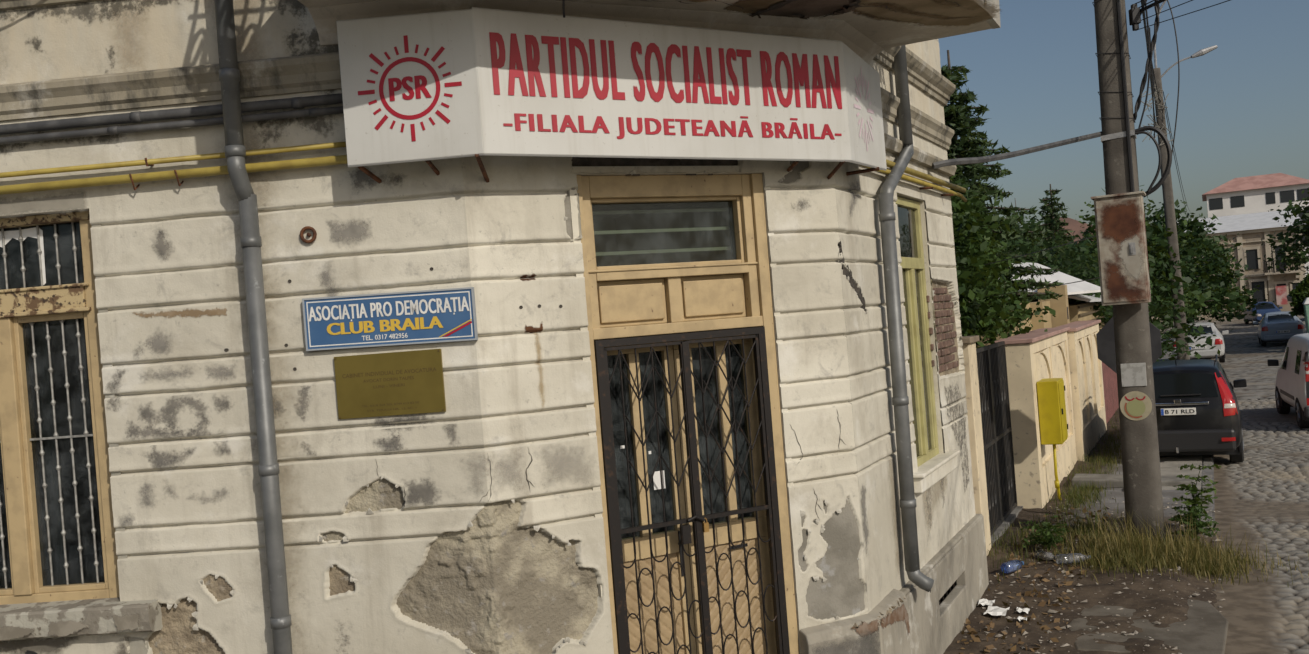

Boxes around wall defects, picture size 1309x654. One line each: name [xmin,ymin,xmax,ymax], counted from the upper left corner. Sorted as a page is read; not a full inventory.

flaking render [749,0,861,20]
crack [837,242,867,314]
flaking render [345,476,435,514]
flaking render [199,574,236,602]
flaking render [329,565,358,596]
flaking render [396,499,599,654]
peeling [798,487,910,637]
peeling [0,620,89,641]
flaking render [112,597,225,654]